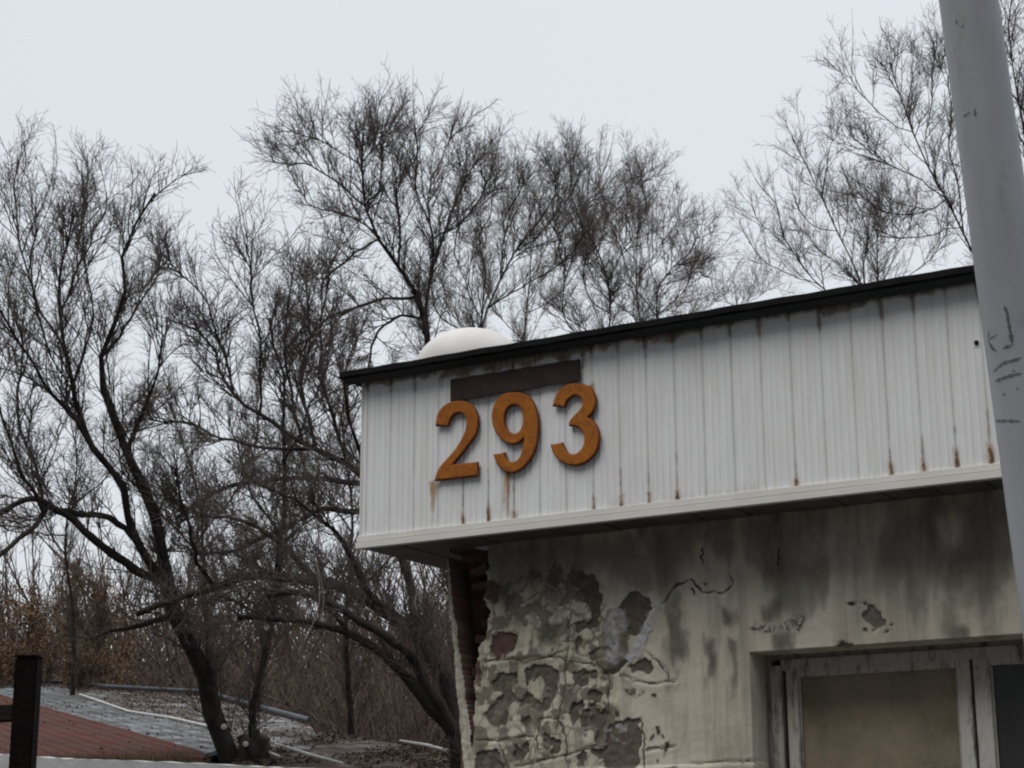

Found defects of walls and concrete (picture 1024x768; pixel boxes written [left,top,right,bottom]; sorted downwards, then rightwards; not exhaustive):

crack [662,546,733,605]
water stain [605,601,685,663]
flaking render [848,602,893,633]
flaking render [470,563,669,768]